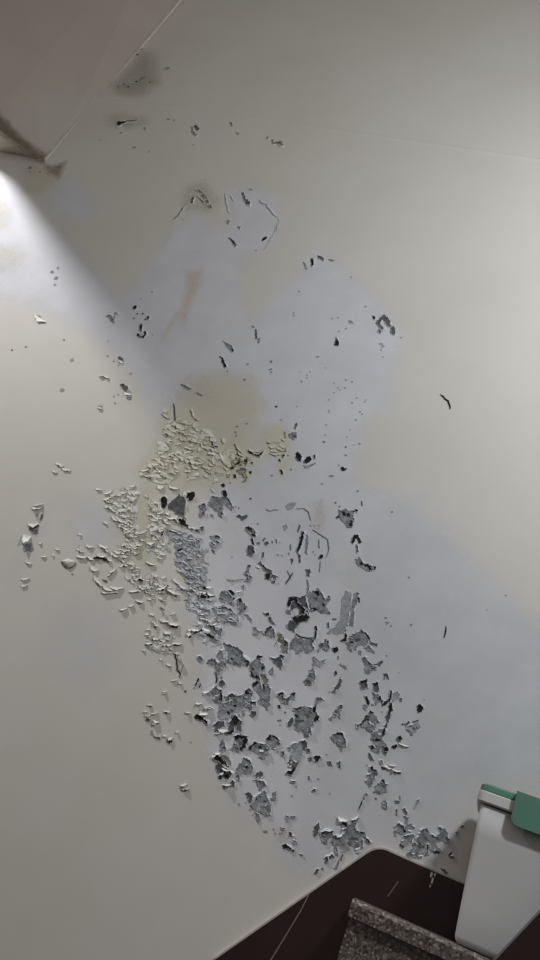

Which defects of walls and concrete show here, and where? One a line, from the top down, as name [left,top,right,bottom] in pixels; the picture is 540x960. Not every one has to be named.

peeling [22,504,43,564]
water stain [106,365,296,576]
flaking render [77,183,465,875]